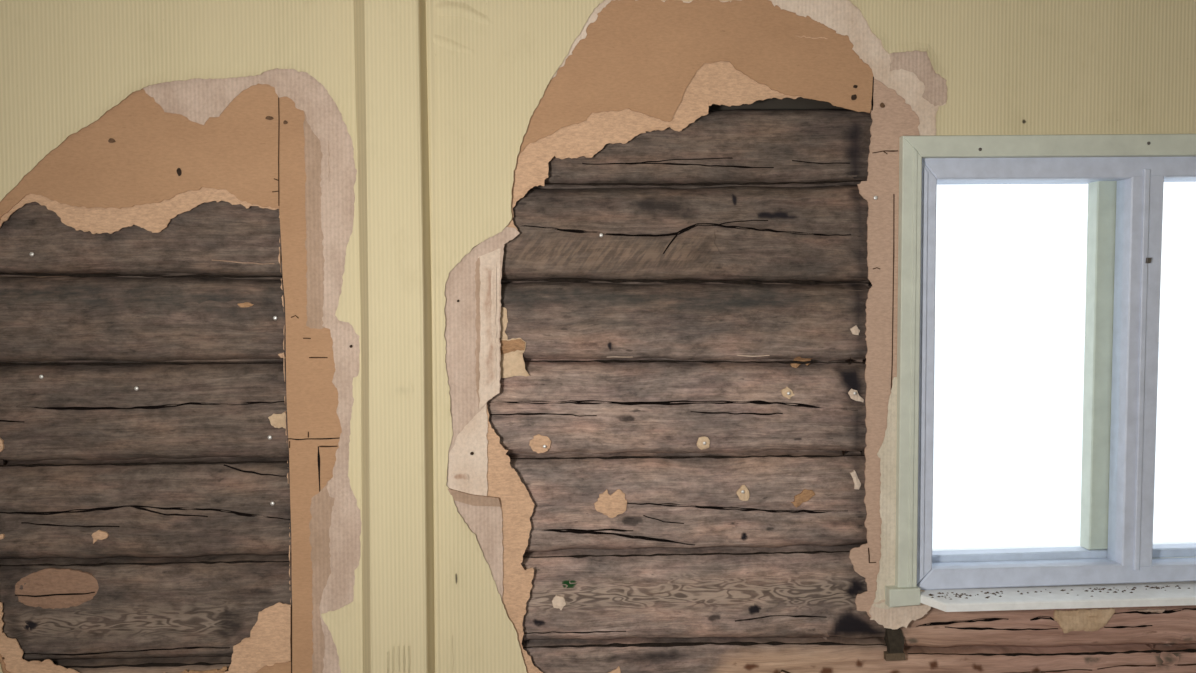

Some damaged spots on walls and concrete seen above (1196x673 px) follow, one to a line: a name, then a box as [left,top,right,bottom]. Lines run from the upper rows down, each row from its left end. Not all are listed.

crack [522,220,851,254]
crack [0,401,285,423]
crack [0,505,290,528]